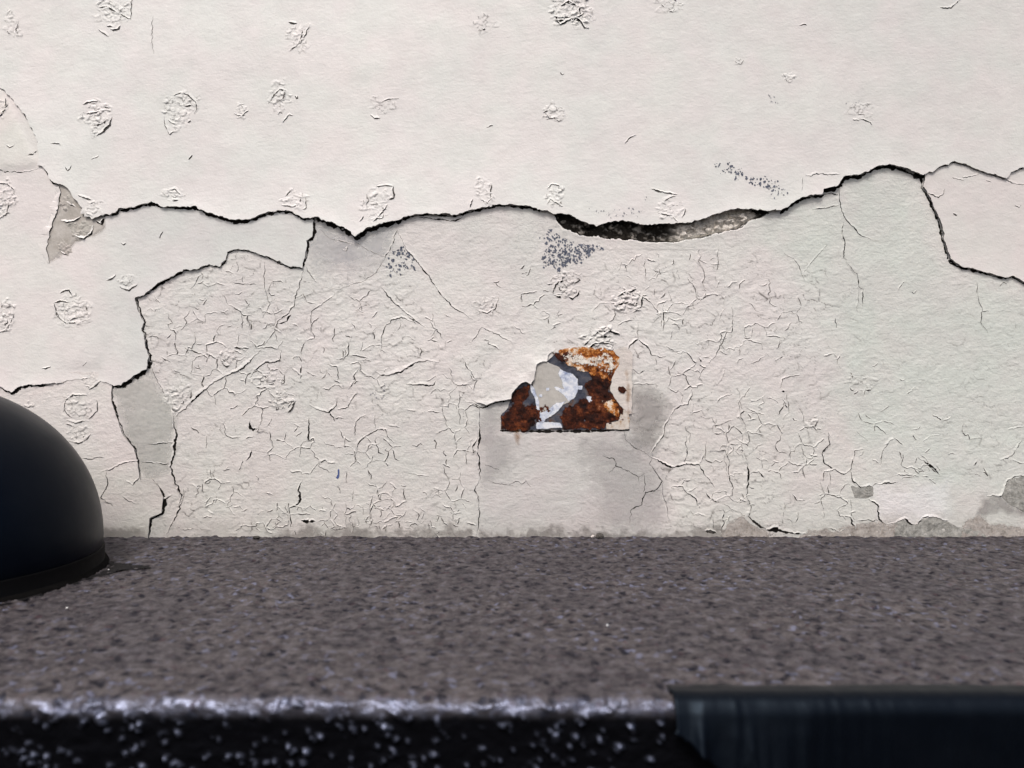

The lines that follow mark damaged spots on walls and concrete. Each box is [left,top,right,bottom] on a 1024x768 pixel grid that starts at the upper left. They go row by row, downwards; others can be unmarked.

spalling [543,183,764,242]
peeling [923,161,1024,282]
peeling [0,88,314,538]
peeling [550,270,580,300]
crack [0,384,53,395]
peeling [471,342,556,405]
crack [82,162,1024,537]
corrosion [501,347,626,432]
peeling [577,324,633,414]
spalling [851,486,873,498]
spalling [1002,476,1024,512]
spalling [800,516,1024,538]